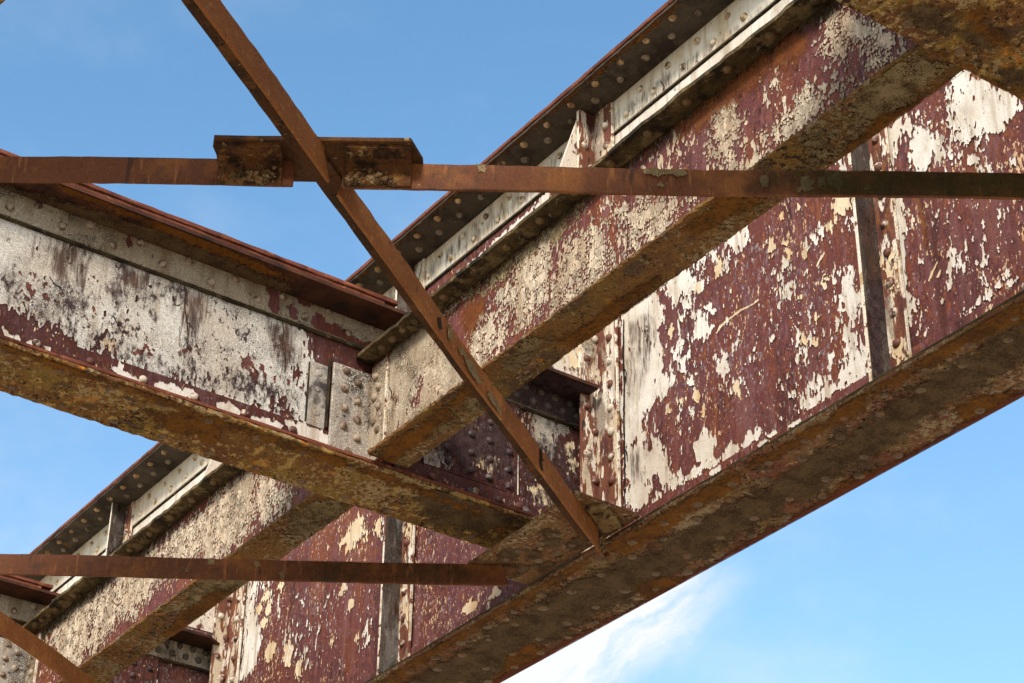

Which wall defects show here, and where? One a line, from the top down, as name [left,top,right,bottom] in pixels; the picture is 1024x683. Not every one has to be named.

peeling [615,0,793,145]
peeling [887,70,1023,173]
rust [228,164,278,186]
damp [47,241,89,295]
damp [121,265,154,290]
peeling [0,218,371,444]
damp [172,282,211,344]
damp [267,316,295,367]
rust [548,276,668,369]
peeling [560,198,868,512]
rust [0,344,483,517]
rust [375,299,1024,683]